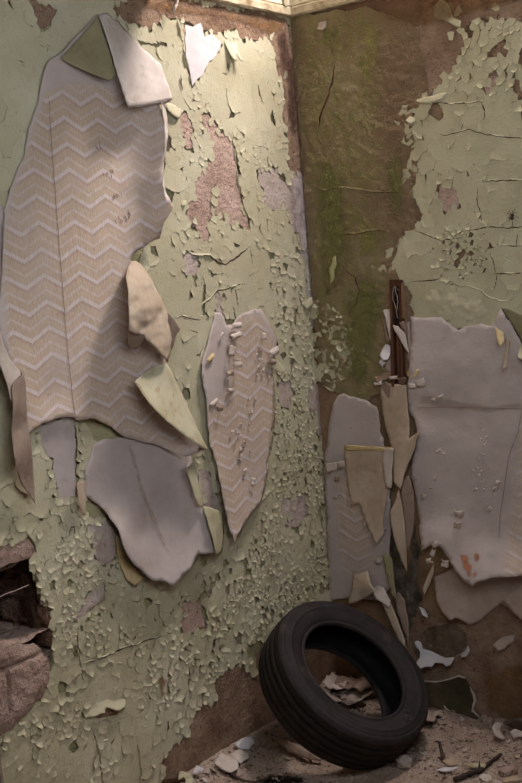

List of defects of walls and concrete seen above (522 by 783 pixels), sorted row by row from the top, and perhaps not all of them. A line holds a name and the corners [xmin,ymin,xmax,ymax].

peeling [0,0,303,518]
flaking render [196,0,522,646]
crack [409,174,522,301]
crack [433,100,522,139]
peeling [0,367,276,783]
flaking render [305,649,338,685]